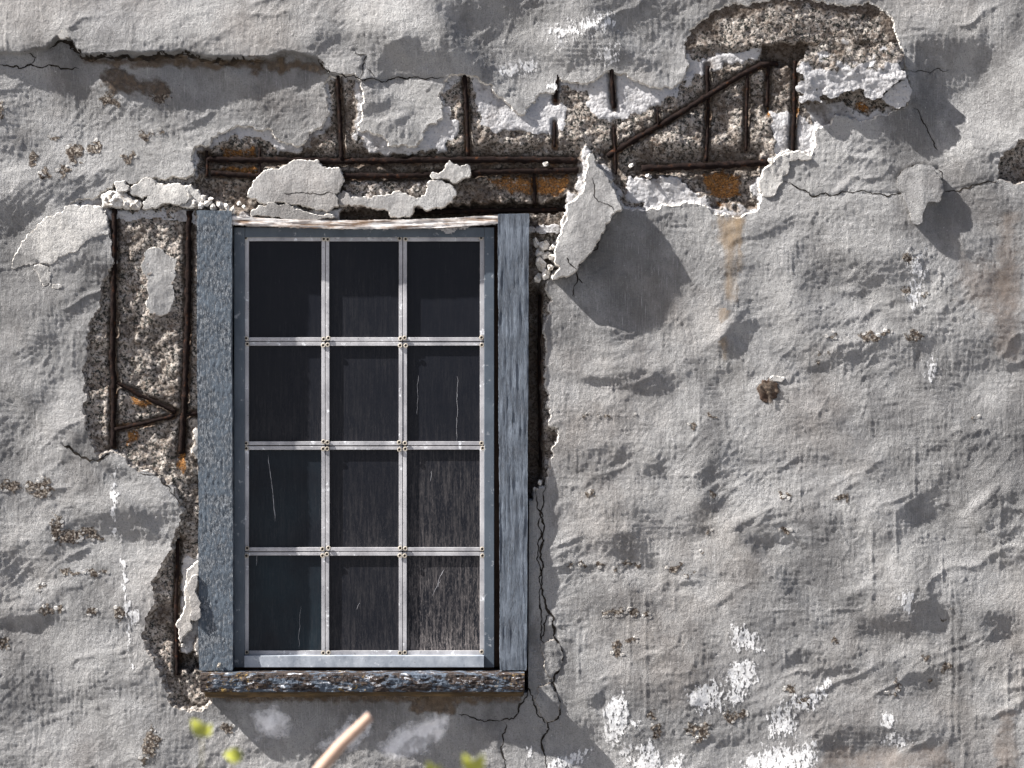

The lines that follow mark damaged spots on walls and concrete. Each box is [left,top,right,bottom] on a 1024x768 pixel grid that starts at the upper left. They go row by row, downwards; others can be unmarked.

crack [0,39,265,70]
corrosion [482,174,569,196]
corrosion [703,170,741,206]
crack [787,108,997,197]
spalling [997,139,1024,185]
spalling [12,0,912,506]
peeling [857,329,926,342]
spalling [82,191,212,713]
peeling [59,568,110,578]
crack [459,480,564,768]